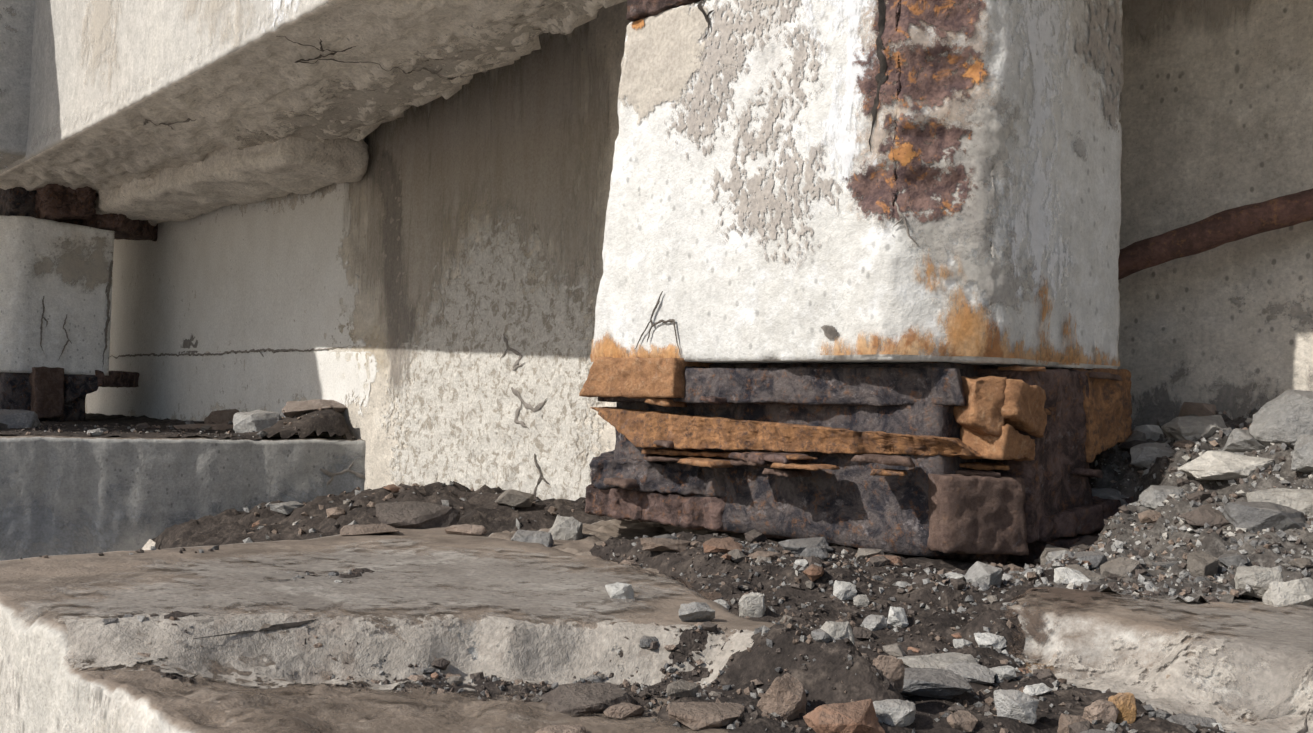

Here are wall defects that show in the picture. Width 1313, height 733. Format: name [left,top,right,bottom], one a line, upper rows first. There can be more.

peeling [618,0,842,268]
crack [869,0,888,152]
rust [845,0,990,222]
crack [40,296,72,359]
crack [102,260,357,371]
rust [821,282,1123,381]
rust [645,396,735,407]
rust [603,477,640,489]
rust [653,440,916,477]
spalling [56,611,754,698]